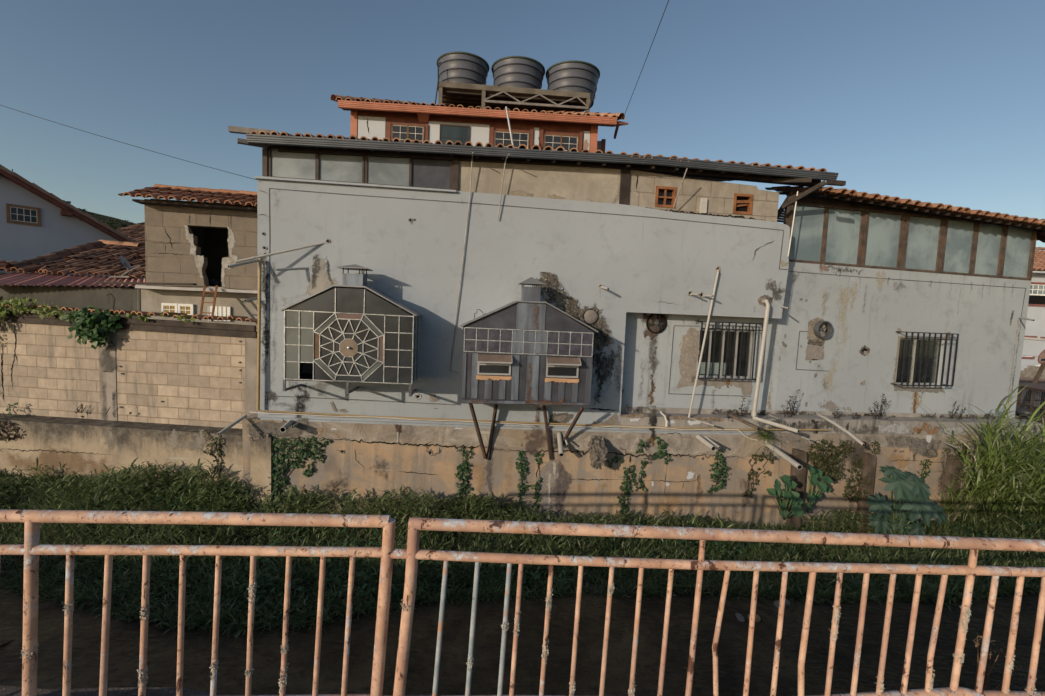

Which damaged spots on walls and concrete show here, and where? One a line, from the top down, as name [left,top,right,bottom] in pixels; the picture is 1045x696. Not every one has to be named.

flaking render [184,225,204,278]
crack [631,175,774,259]
peeling [677,327,753,395]
water stain [537,421,571,517]